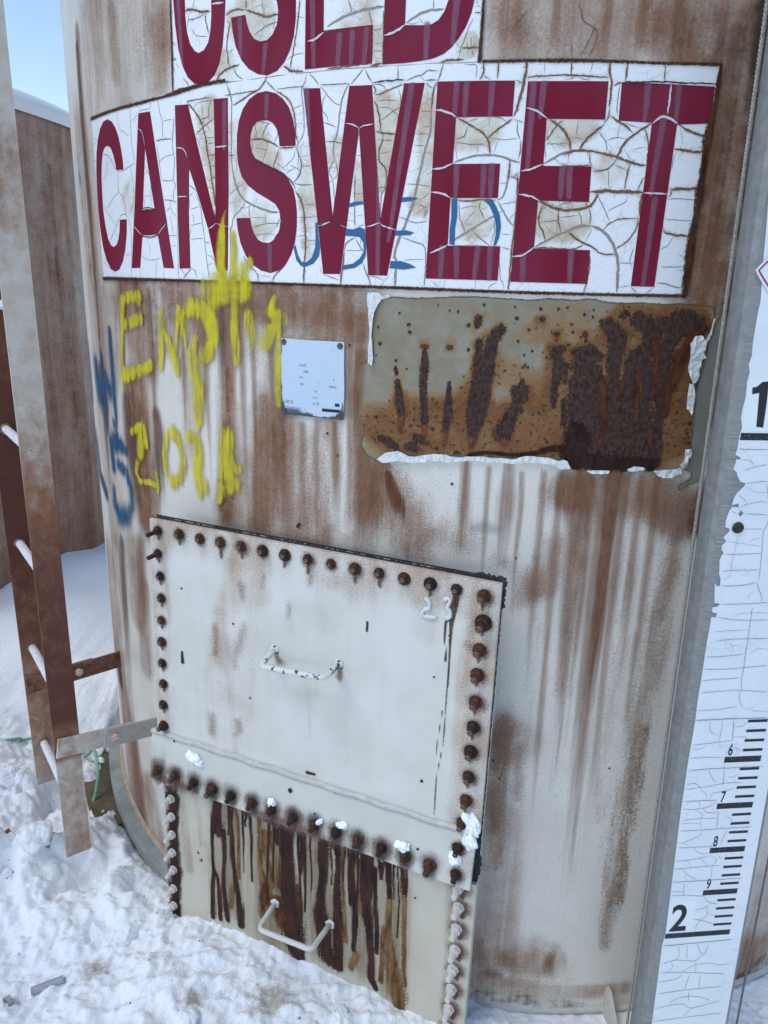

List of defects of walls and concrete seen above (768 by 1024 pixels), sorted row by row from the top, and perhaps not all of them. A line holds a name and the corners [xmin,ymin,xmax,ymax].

crack [94,0,715,294]
peeling [357,292,727,491]
corrosion [119,535,128,640]
corrosion [132,741,198,917]
corrosion [210,782,412,1011]
corrosion [433,589,463,814]
corrosion [464,677,485,812]
corrosion [559,470,623,761]
corrosion [671,482,705,534]
crack [655,449,768,1022]